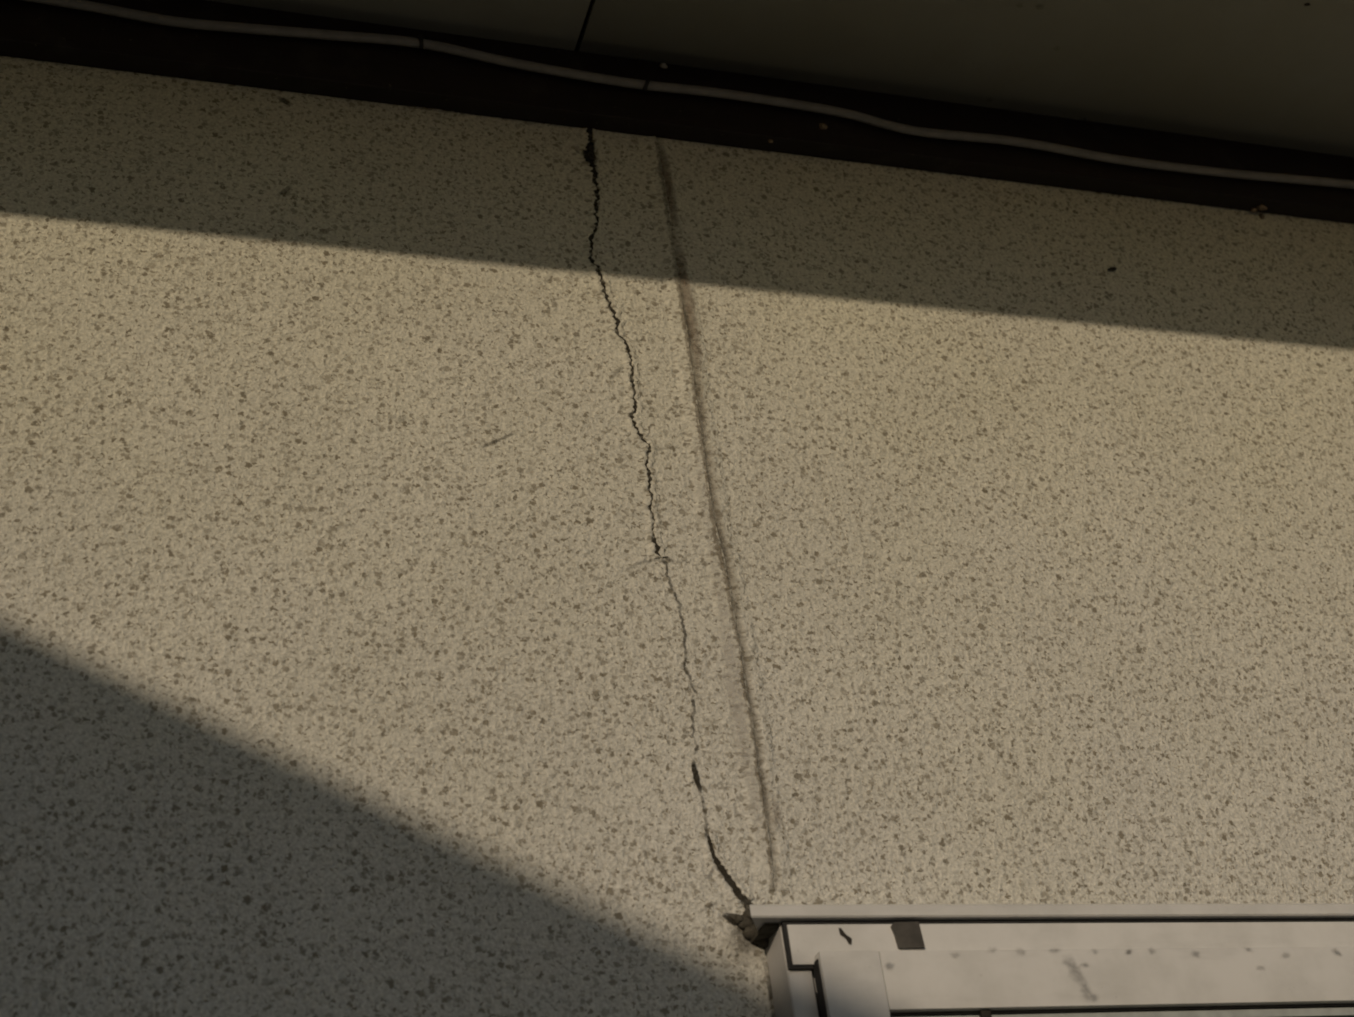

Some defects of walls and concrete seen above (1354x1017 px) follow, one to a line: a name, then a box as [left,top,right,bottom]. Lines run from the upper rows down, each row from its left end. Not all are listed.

crack [577,128,702,790]
crack [699,831,755,909]